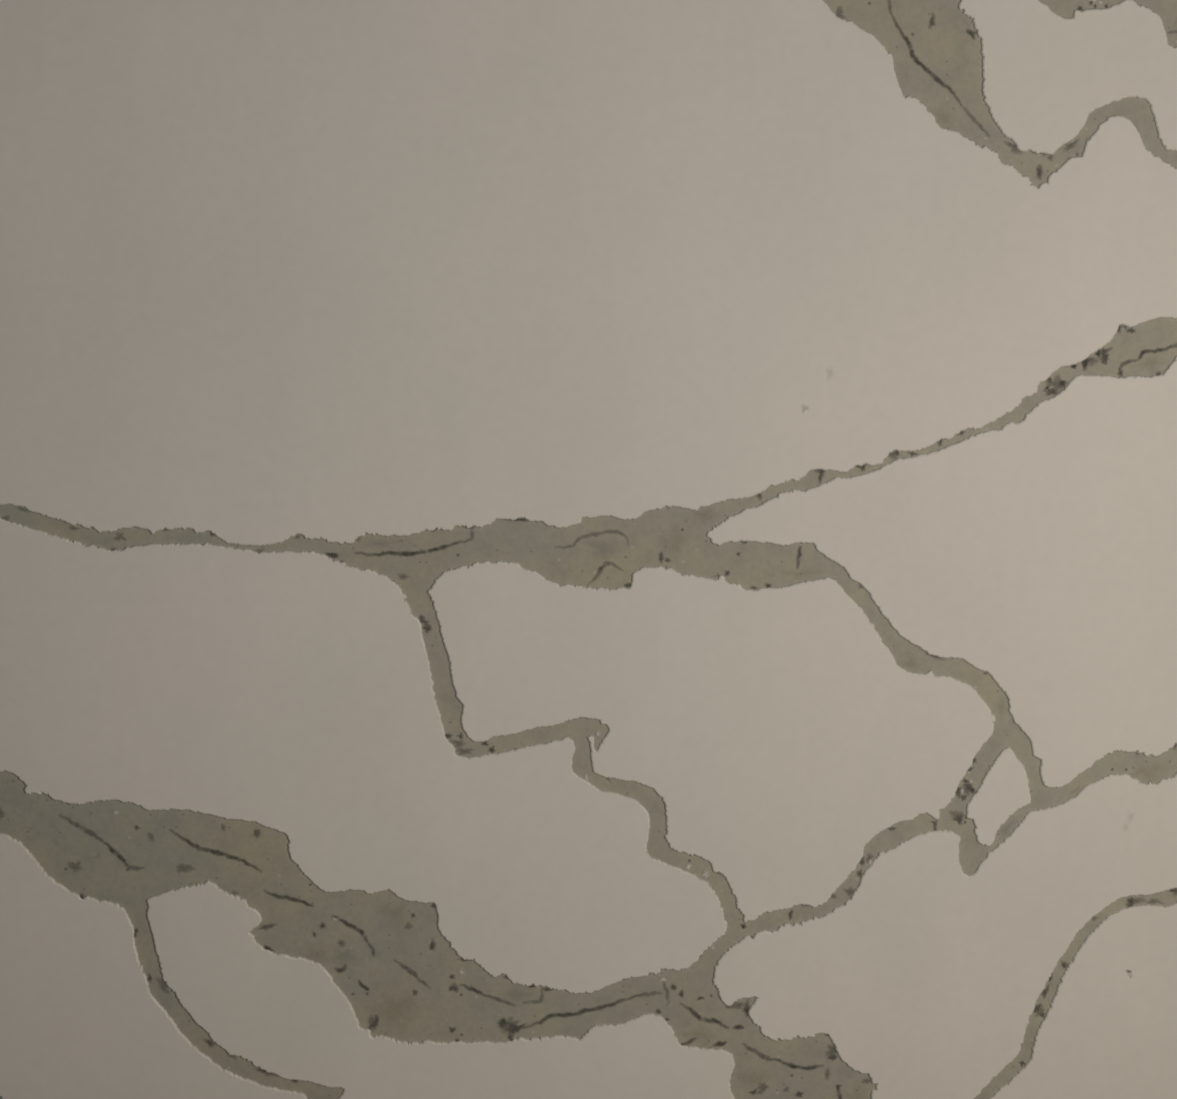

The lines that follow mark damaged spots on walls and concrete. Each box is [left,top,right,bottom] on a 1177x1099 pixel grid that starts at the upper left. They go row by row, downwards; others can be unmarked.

spalling [824,0,1057,187]
spalling [1040,0,1144,18]
spalling [328,506,845,593]
spalling [0,771,876,1099]